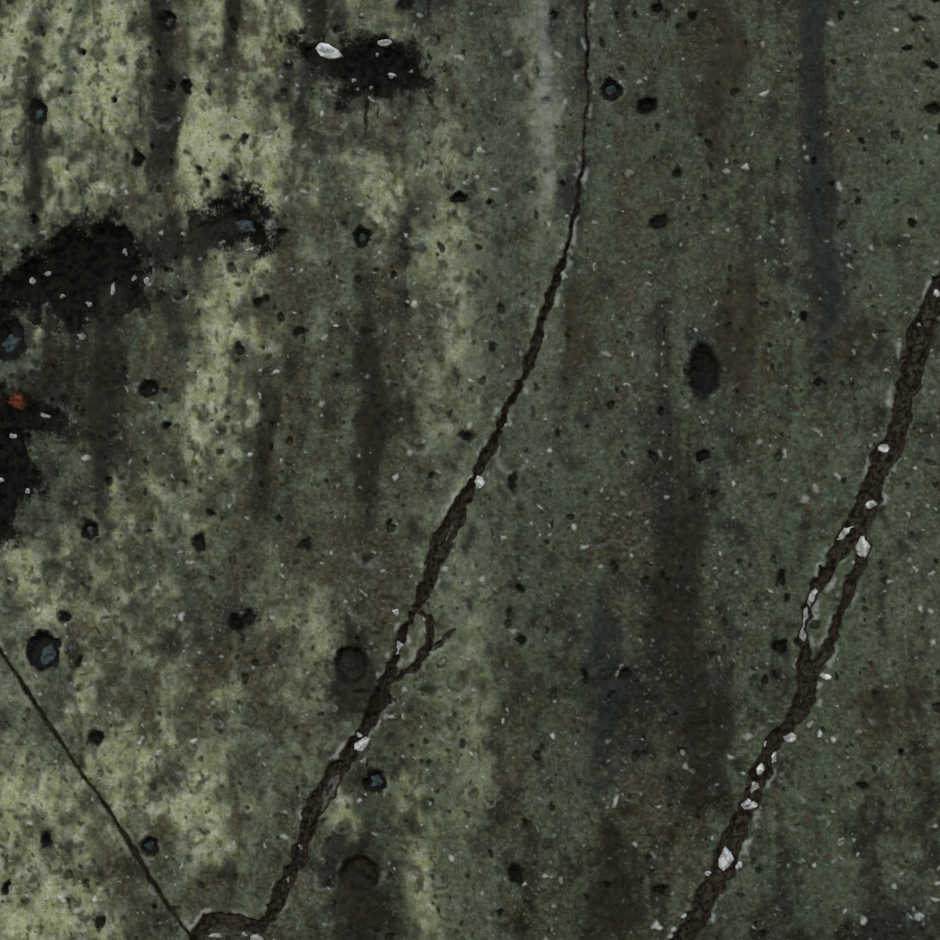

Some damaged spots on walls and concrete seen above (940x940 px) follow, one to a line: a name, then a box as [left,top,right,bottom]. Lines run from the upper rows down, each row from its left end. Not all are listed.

leakage [24,278,129,489]
crack [0,0,590,940]
crack [670,275,940,940]